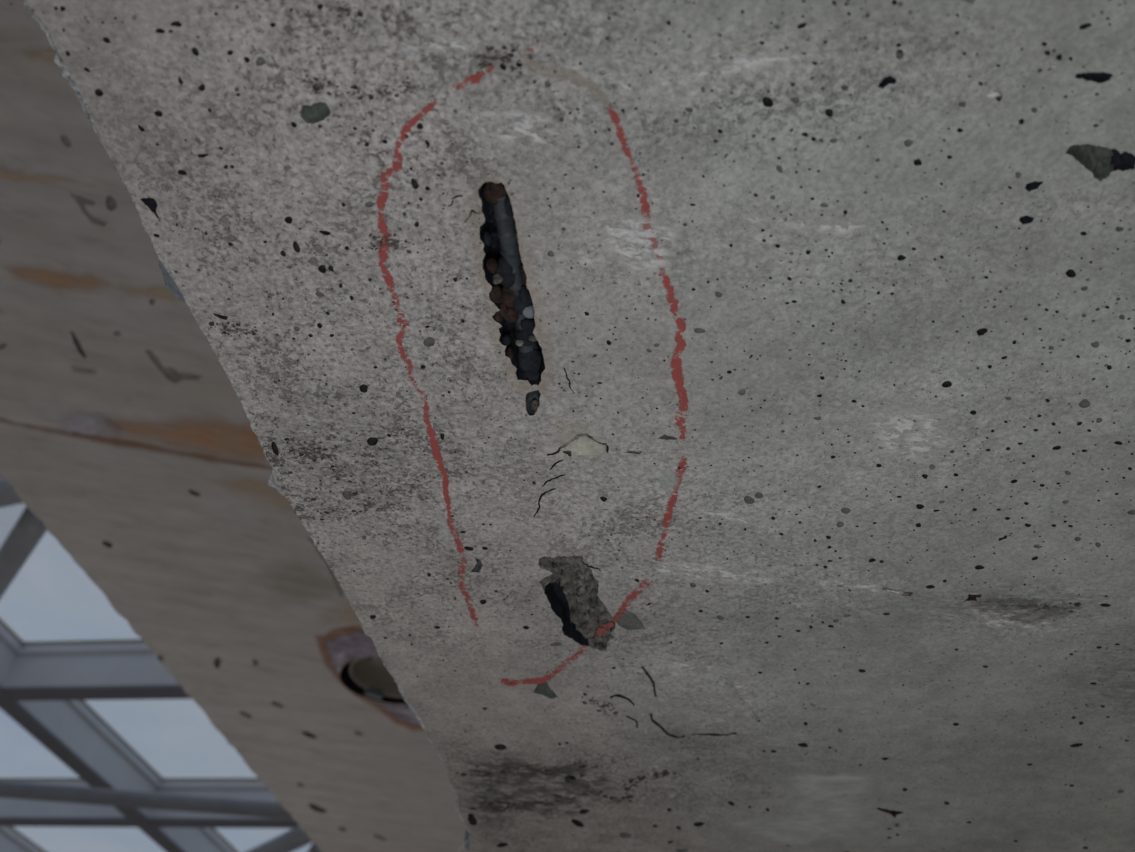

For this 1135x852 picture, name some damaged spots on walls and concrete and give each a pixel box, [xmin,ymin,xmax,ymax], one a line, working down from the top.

spalling [414,173,656,419]
spalling [439,505,651,654]